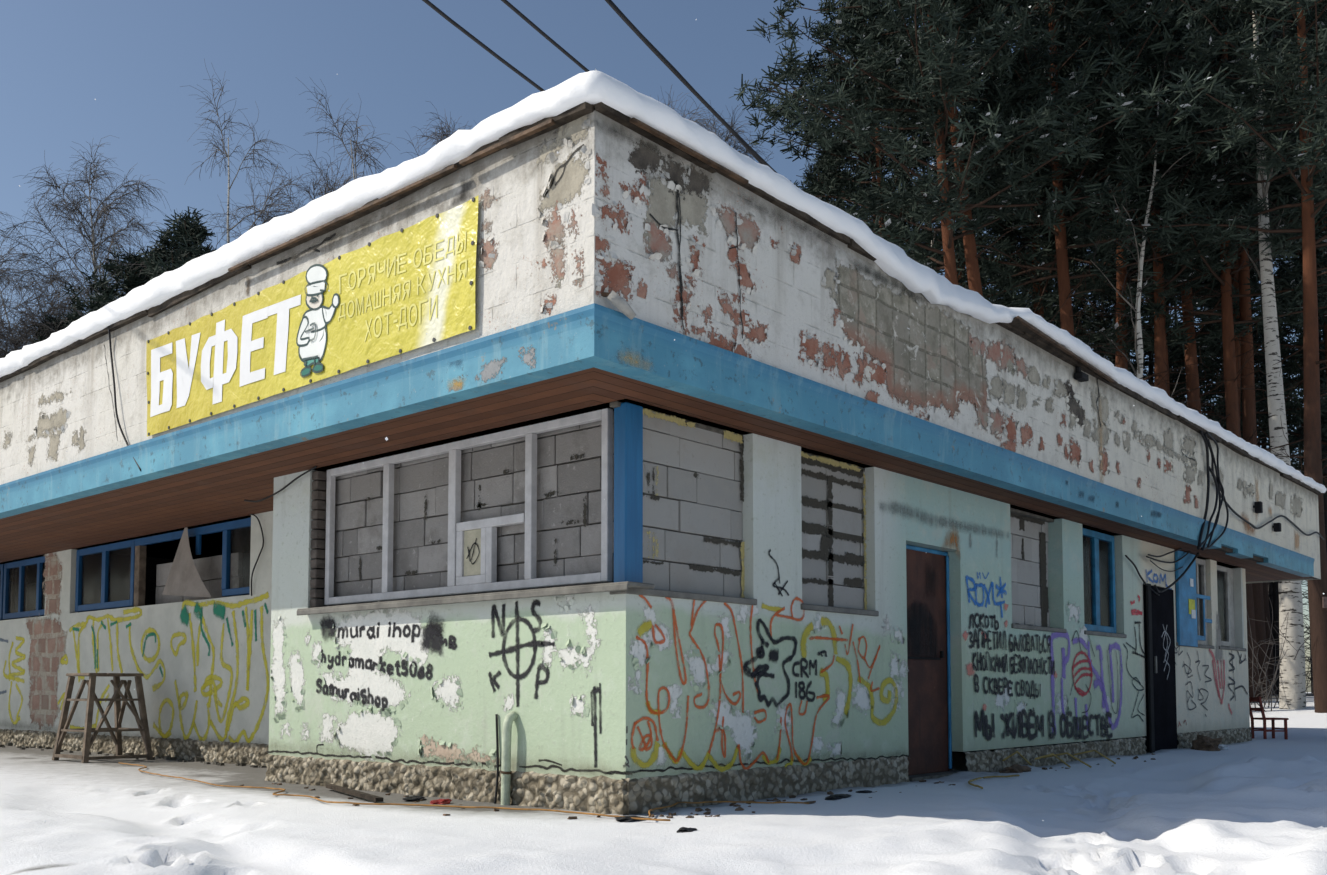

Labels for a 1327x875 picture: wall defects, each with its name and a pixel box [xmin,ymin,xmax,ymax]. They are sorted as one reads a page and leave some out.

crack [649,181,684,330]
spalling [536,115,803,358]
peeling [28,387,86,467]
spalling [798,258,1303,518]
spalling [26,552,67,730]
peeling [540,605,603,678]
peeling [270,608,429,761]
peeling [430,674,463,712]
peeling [501,693,514,713]
peeling [569,695,590,718]
peeling [417,734,501,771]